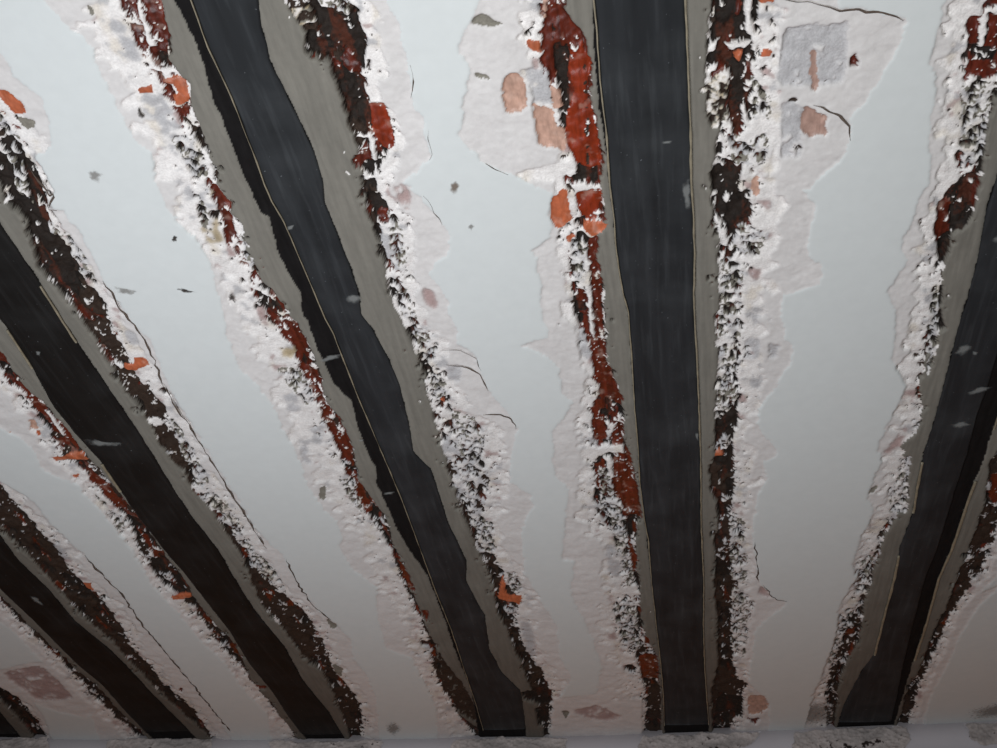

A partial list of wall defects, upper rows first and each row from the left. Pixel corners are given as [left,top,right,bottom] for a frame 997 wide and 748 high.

flaking render [0,0,479,740]
spalling [162,0,908,737]
crack [788,0,904,21]
spalling [805,0,997,729]